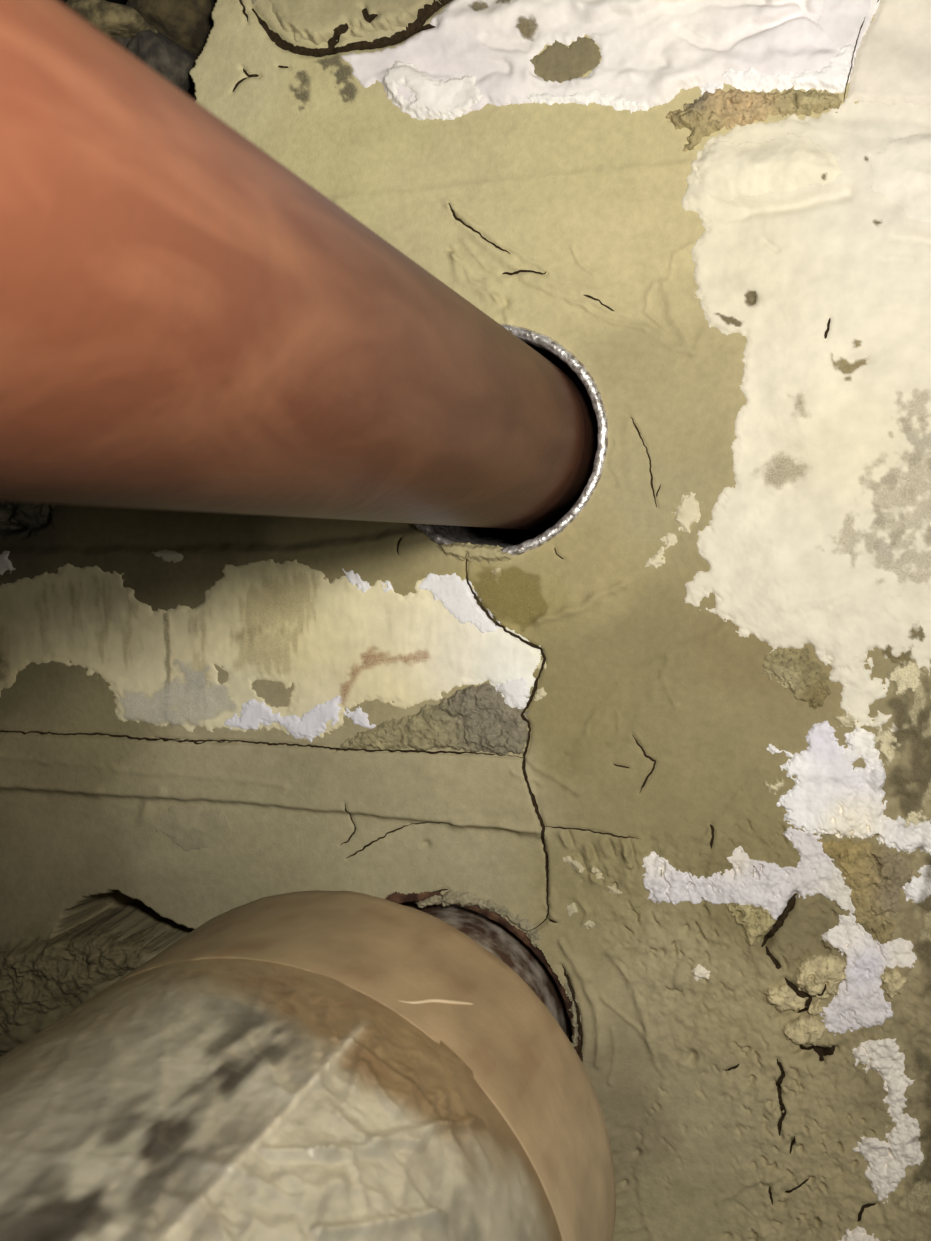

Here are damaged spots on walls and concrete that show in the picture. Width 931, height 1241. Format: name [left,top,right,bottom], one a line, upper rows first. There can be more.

peeling [0,549,547,757]
peeling [341,0,931,1204]
crack [0,553,638,931]
water stain [891,684,931,813]
water stain [917,897,931,960]
crack [562,965,583,1060]
peeling [839,1226,889,1241]
water stain [899,1127,931,1212]